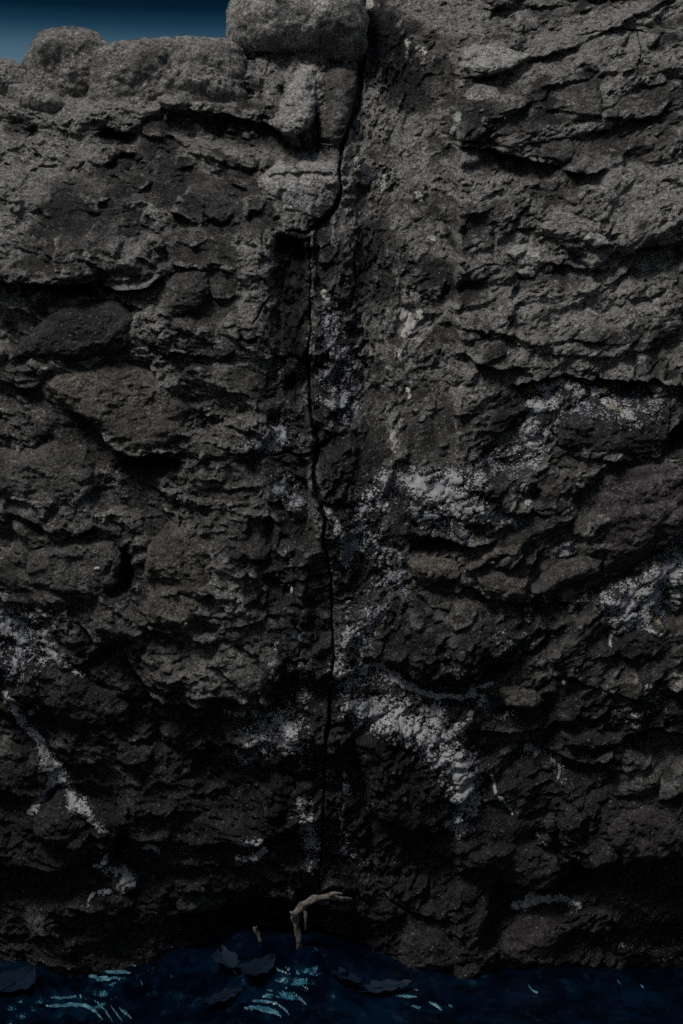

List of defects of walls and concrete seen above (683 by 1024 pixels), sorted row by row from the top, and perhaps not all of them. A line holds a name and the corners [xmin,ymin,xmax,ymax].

crack [252,58,364,886]